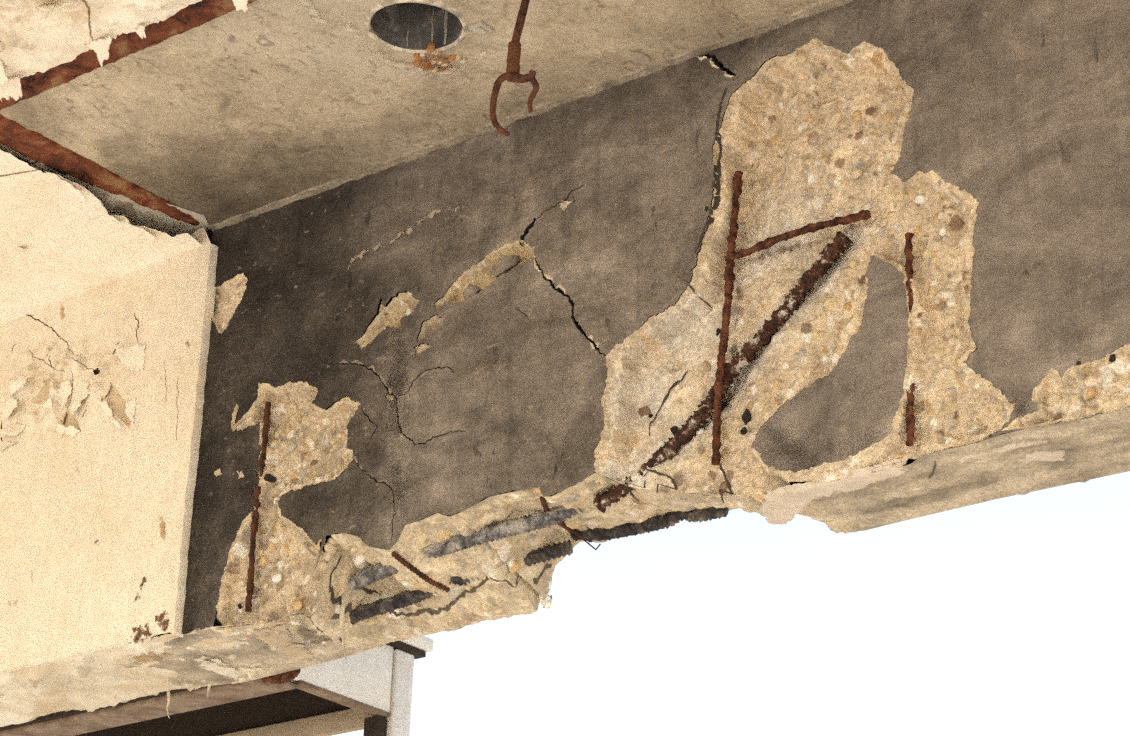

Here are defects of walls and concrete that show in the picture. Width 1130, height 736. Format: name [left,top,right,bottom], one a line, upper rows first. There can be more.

peeling [0,60,23,102]
peeling [84,35,112,68]
corrosion [0,0,256,226]
corrosion [412,42,467,73]
spalling [212,273,248,333]
spalling [356,291,420,349]
spalling [415,240,535,354]
crack [520,185,606,356]
spalling [594,38,1130,502]
peeling [0,360,136,451]
crack [338,360,465,541]
spalling [216,381,360,659]